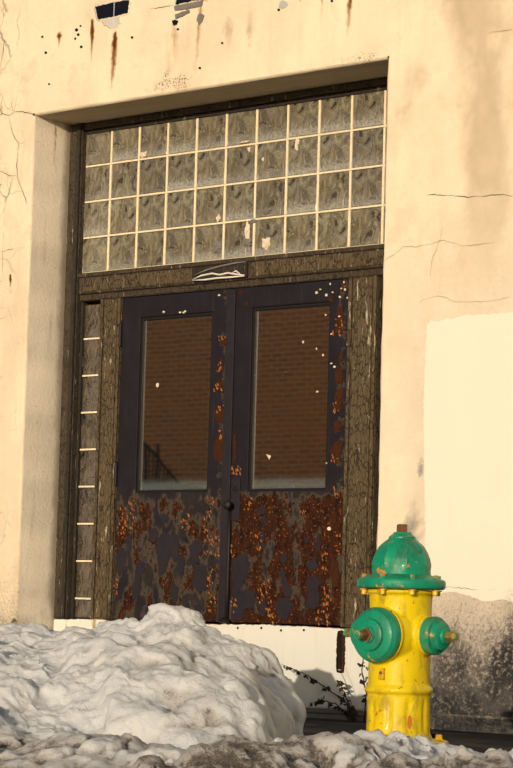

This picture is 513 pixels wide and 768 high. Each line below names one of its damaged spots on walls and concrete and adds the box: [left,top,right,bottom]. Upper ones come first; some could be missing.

flaking render [103,16,120,29]
peeling [172,0,205,30]
crack [0,103,34,204]
corrosion [213,408,237,464]
corrosion [330,353,344,464]
damp [430,627,513,734]